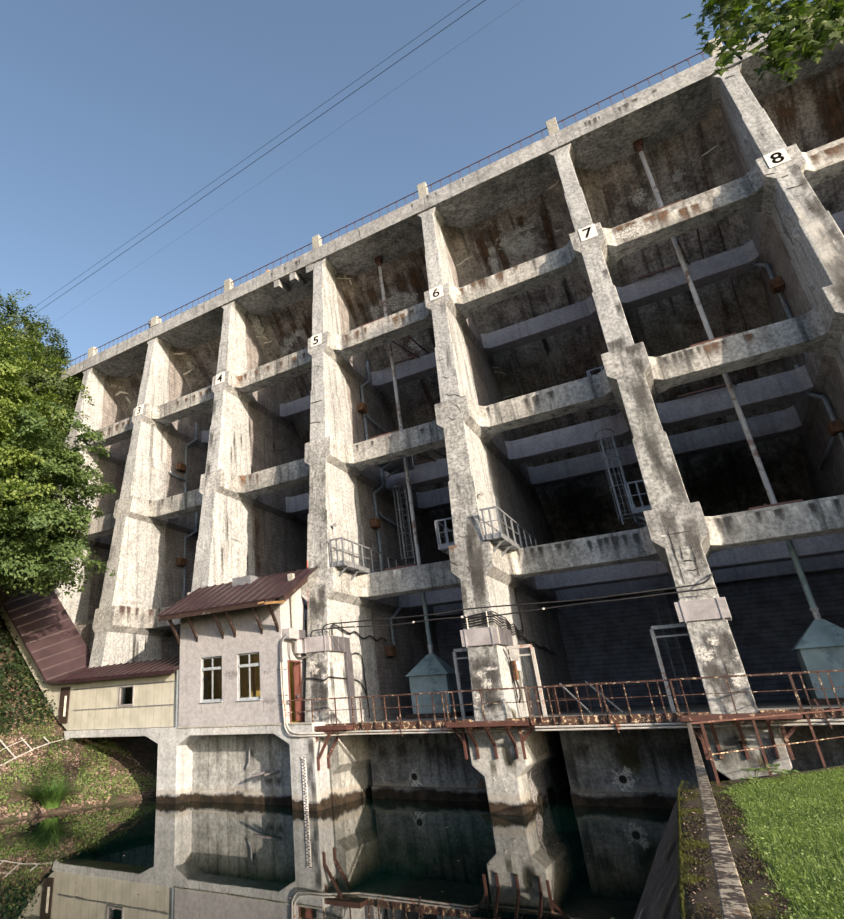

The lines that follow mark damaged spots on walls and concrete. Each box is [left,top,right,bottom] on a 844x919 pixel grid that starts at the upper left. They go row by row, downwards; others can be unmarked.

corrosion [615,210,668,233]
corrosion [679,203,700,217]
water stain [488,222,538,279]
water stain [795,199,844,300]
corrosion [343,268,427,323]